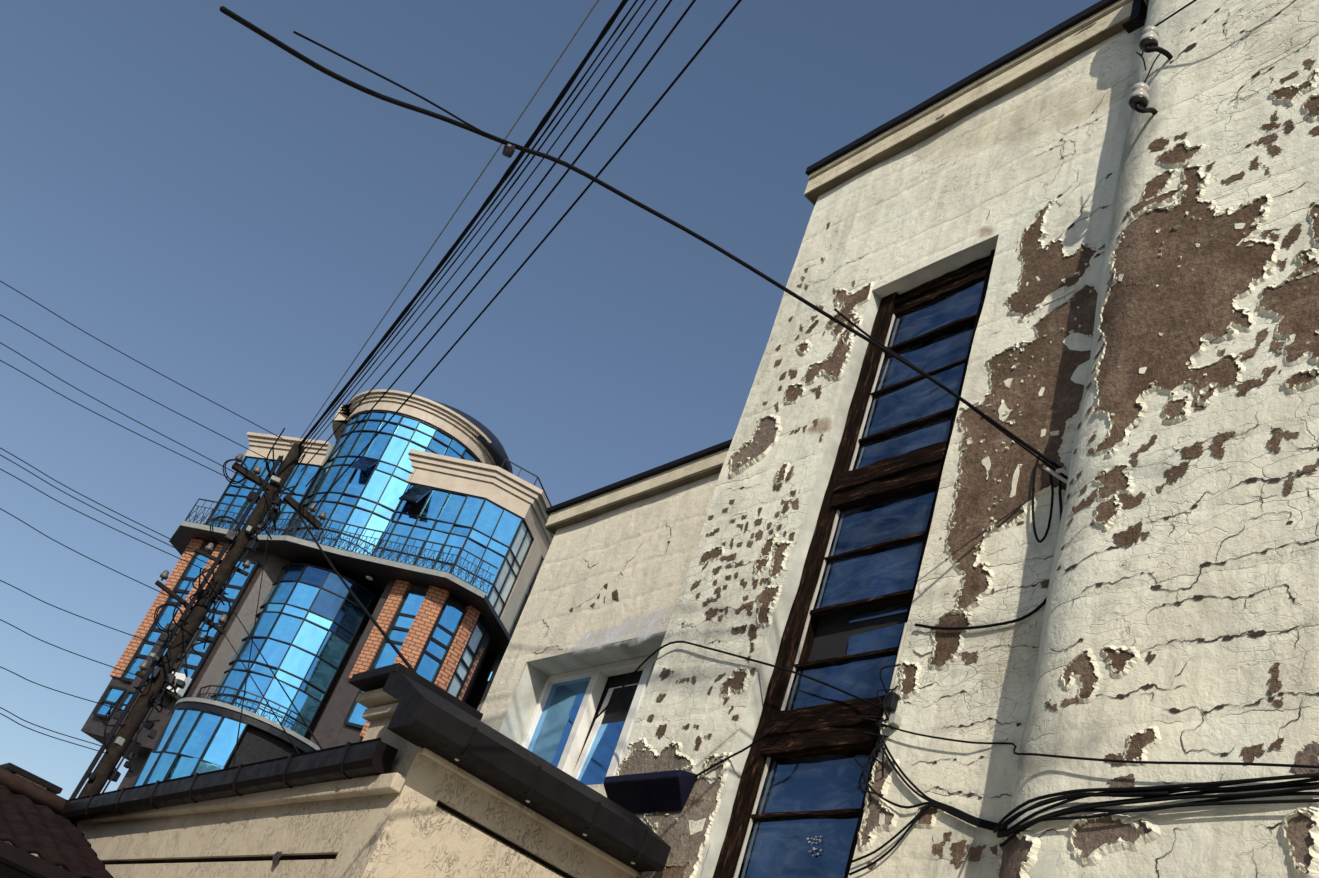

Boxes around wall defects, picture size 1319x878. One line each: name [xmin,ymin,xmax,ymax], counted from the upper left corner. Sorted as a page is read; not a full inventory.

crack [1169,0,1319,114]
peeling [728,281,874,479]
peeling [898,59,1319,700]
crack [954,413,1319,784]
peeling [616,461,799,878]
peeling [1045,645,1156,711]
crack [903,690,1030,799]
flaking render [858,756,1041,878]
flaking render [1068,808,1161,866]
crack [1155,825,1191,878]
crack [1234,822,1282,878]
flaking render [1279,806,1319,878]